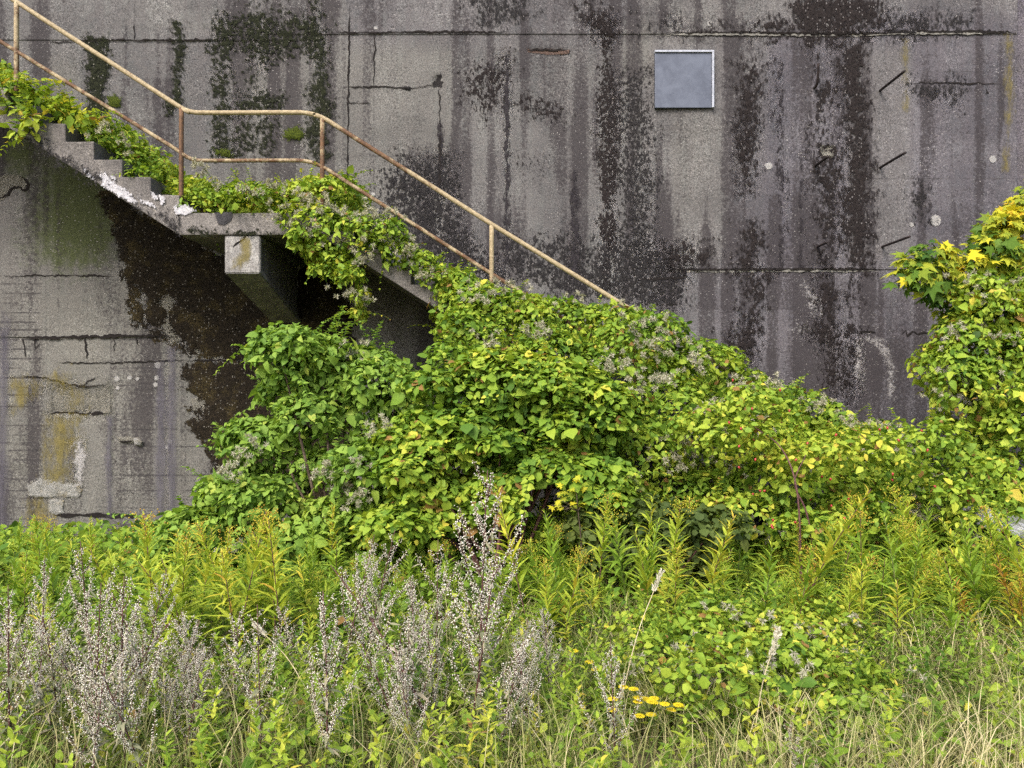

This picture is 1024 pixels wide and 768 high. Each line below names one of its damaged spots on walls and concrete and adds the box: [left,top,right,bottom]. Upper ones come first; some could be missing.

crack [332,5,505,187]
damp [132,205,183,237]
damp [236,239,250,265]
damp [366,0,978,409]
crack [22,333,248,415]